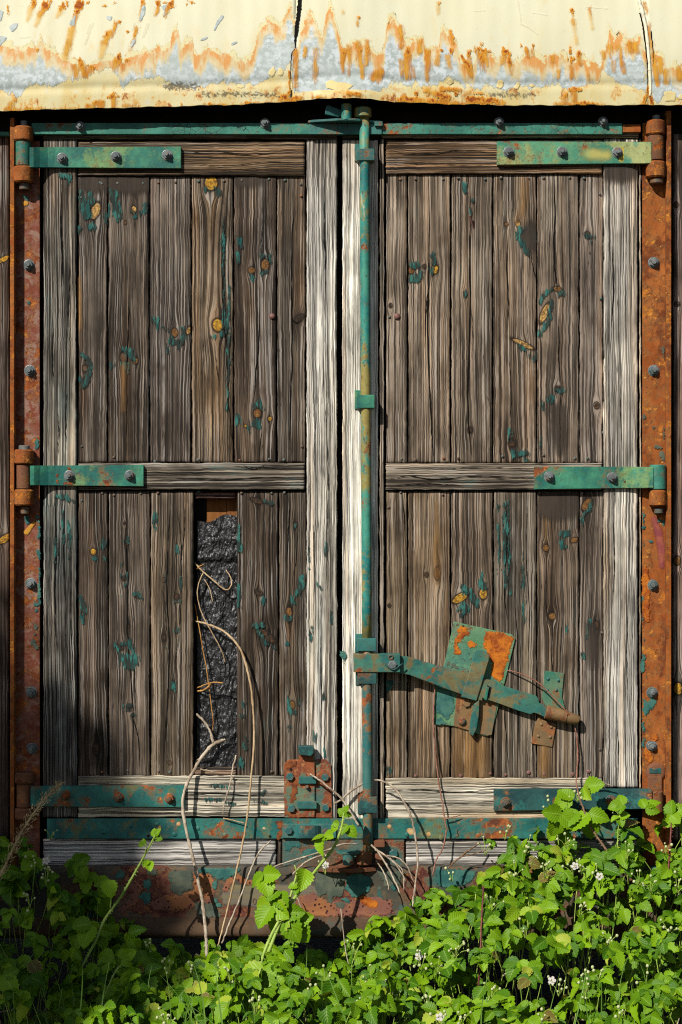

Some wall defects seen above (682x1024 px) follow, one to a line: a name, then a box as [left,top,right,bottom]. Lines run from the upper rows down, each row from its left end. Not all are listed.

corrosion [29,0,138,78]
crack [289,0,301,99]
corrosion [280,47,326,102]
peeling [0,0,682,104]
corrosion [340,40,384,82]
corrosion [394,25,534,106]
corrosion [551,46,605,105]
crack [616,13,654,92]
corrosion [601,26,682,105]
corrosion [453,625,515,682]
corrosion [118,872,252,912]
corrosion [295,892,394,918]